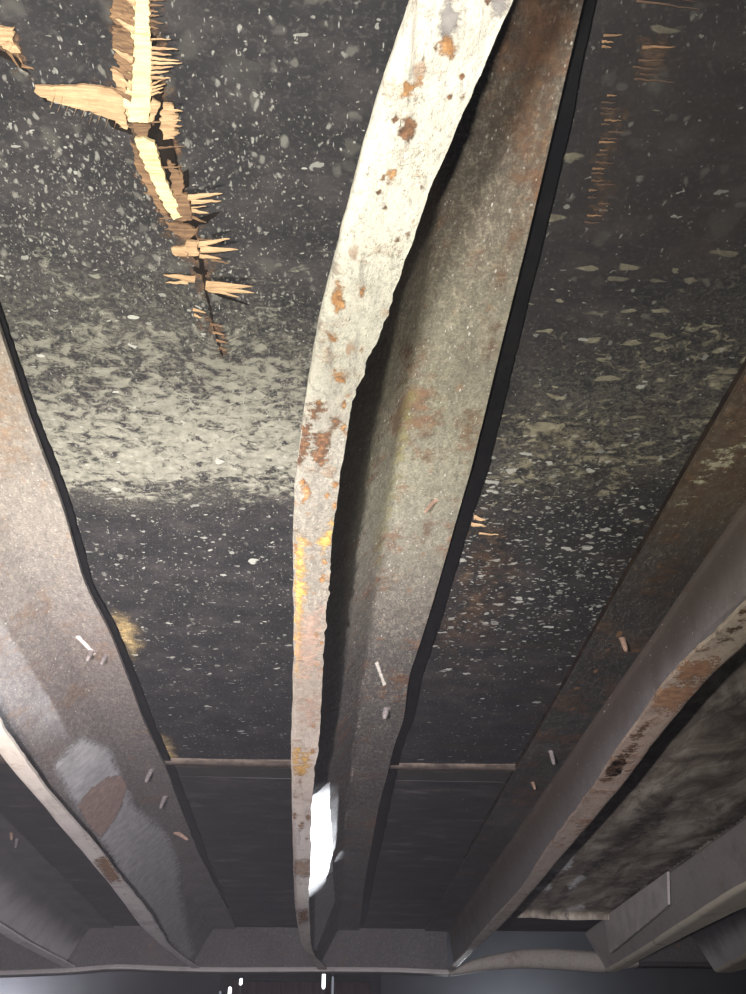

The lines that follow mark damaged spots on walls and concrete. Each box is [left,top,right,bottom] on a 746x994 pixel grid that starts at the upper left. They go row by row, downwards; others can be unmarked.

rust [434,36,456,60]
rust [401,77,423,97]
rust [392,115,417,142]
crack [0,0,253,357]
rust [331,281,345,313]